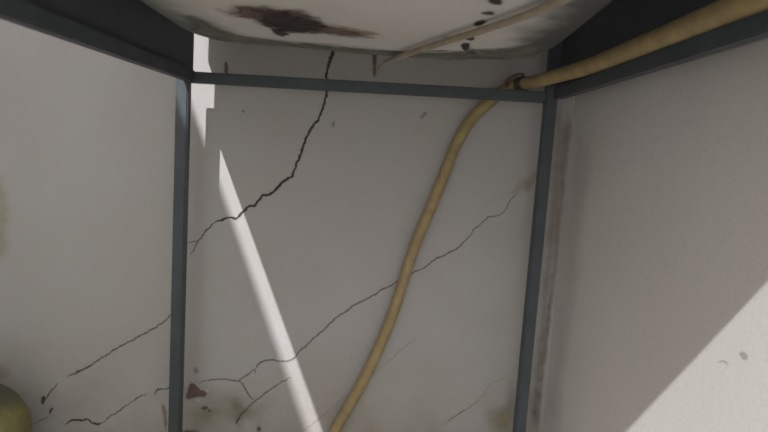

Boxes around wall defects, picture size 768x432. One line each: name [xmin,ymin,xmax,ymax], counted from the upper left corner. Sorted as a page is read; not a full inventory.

crack [187,51,335,254]
crack [33,314,171,426]
crack [198,194,516,432]